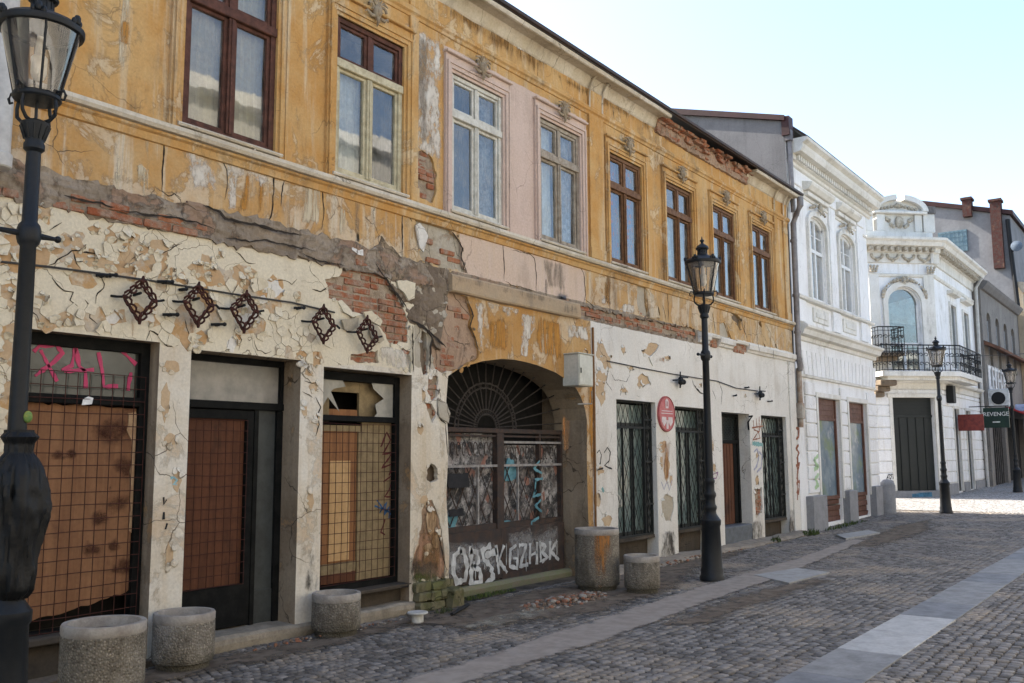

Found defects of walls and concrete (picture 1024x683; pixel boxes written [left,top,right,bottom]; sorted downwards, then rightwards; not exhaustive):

spalling [418,151,436,203]
spalling [654,117,754,185]
crack [64,145,345,292]
spalling [415,221,466,273]
crack [50,250,105,324]
spalling [325,269,482,435]
peeling [583,339,651,406]
spalling [581,286,695,361]
spalling [659,441,673,521]
spalling [412,495,448,582]